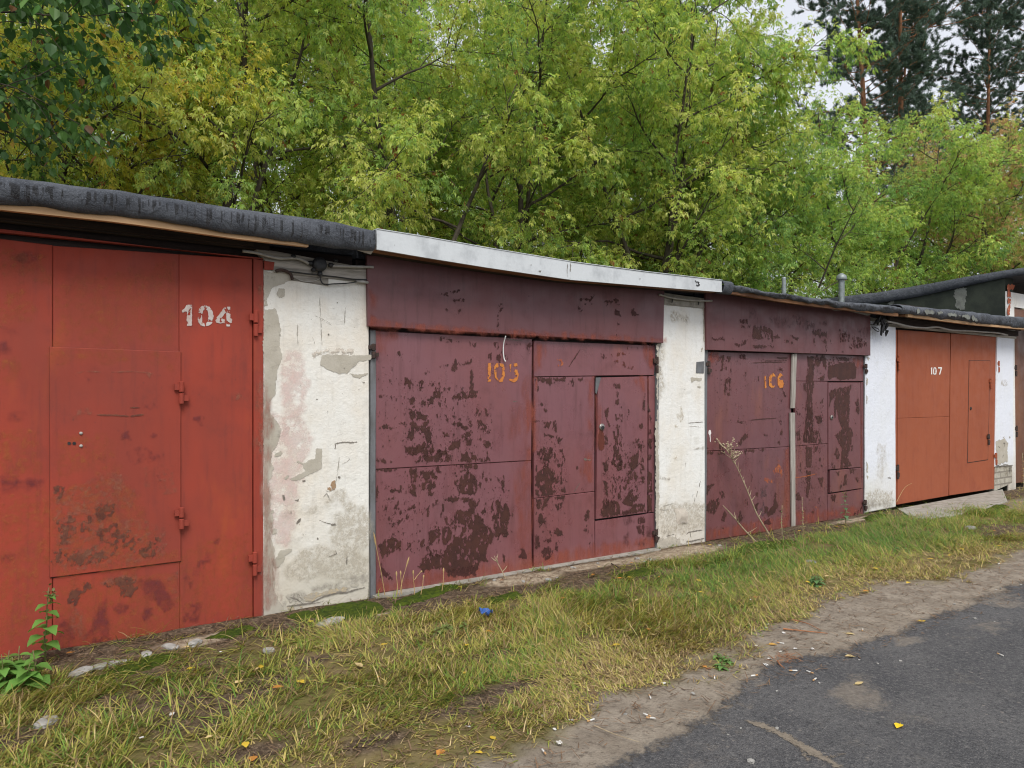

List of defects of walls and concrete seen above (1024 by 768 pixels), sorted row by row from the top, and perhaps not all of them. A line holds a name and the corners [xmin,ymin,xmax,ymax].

rust [67,576,138,606]
rust [51,503,164,566]
peeling [262,271,358,616]
peeling [320,354,371,390]
rust [376,351,513,579]
rust [519,377,583,560]
rust [584,384,653,544]
rust [706,319,867,529]